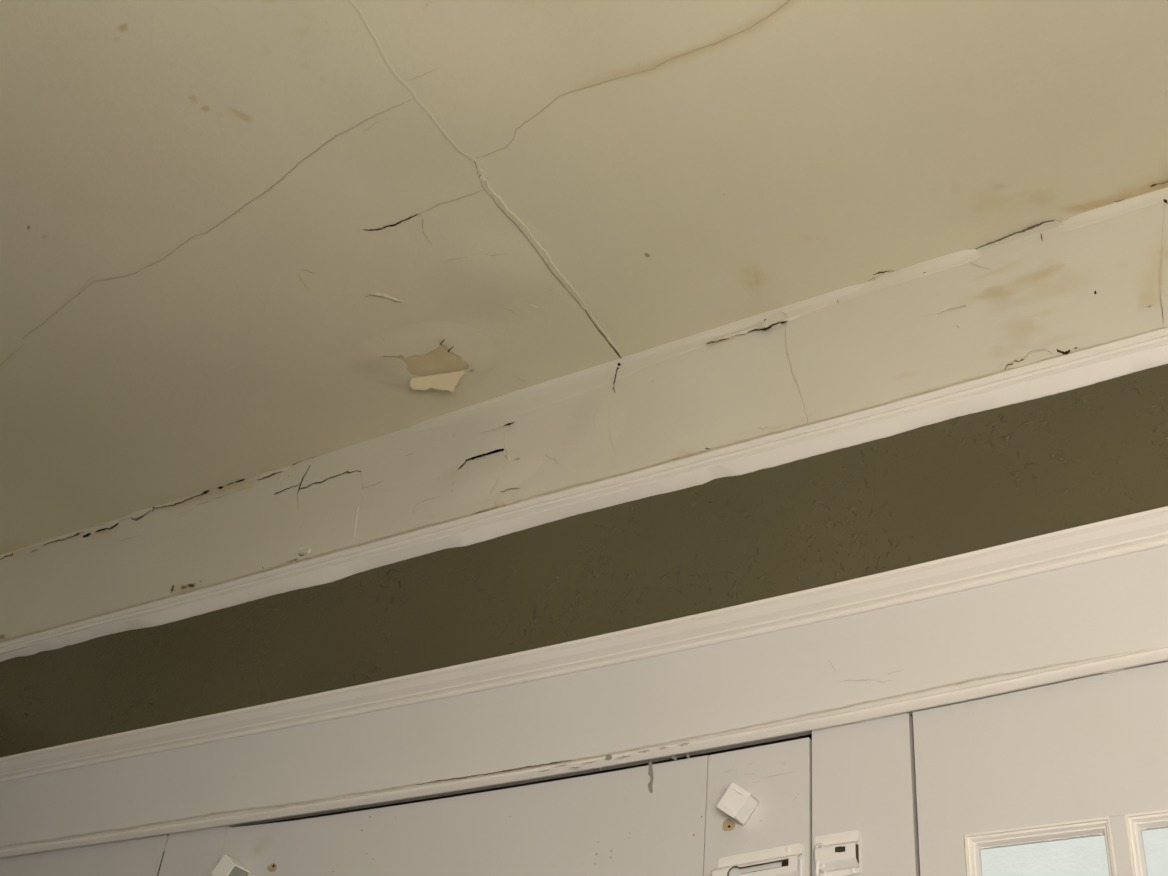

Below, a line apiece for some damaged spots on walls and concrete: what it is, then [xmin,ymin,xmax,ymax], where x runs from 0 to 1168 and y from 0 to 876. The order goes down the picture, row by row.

crack [0,0,790,392]
crack [1159,199,1168,327]
crack [706,312,808,423]
crack [0,456,384,560]